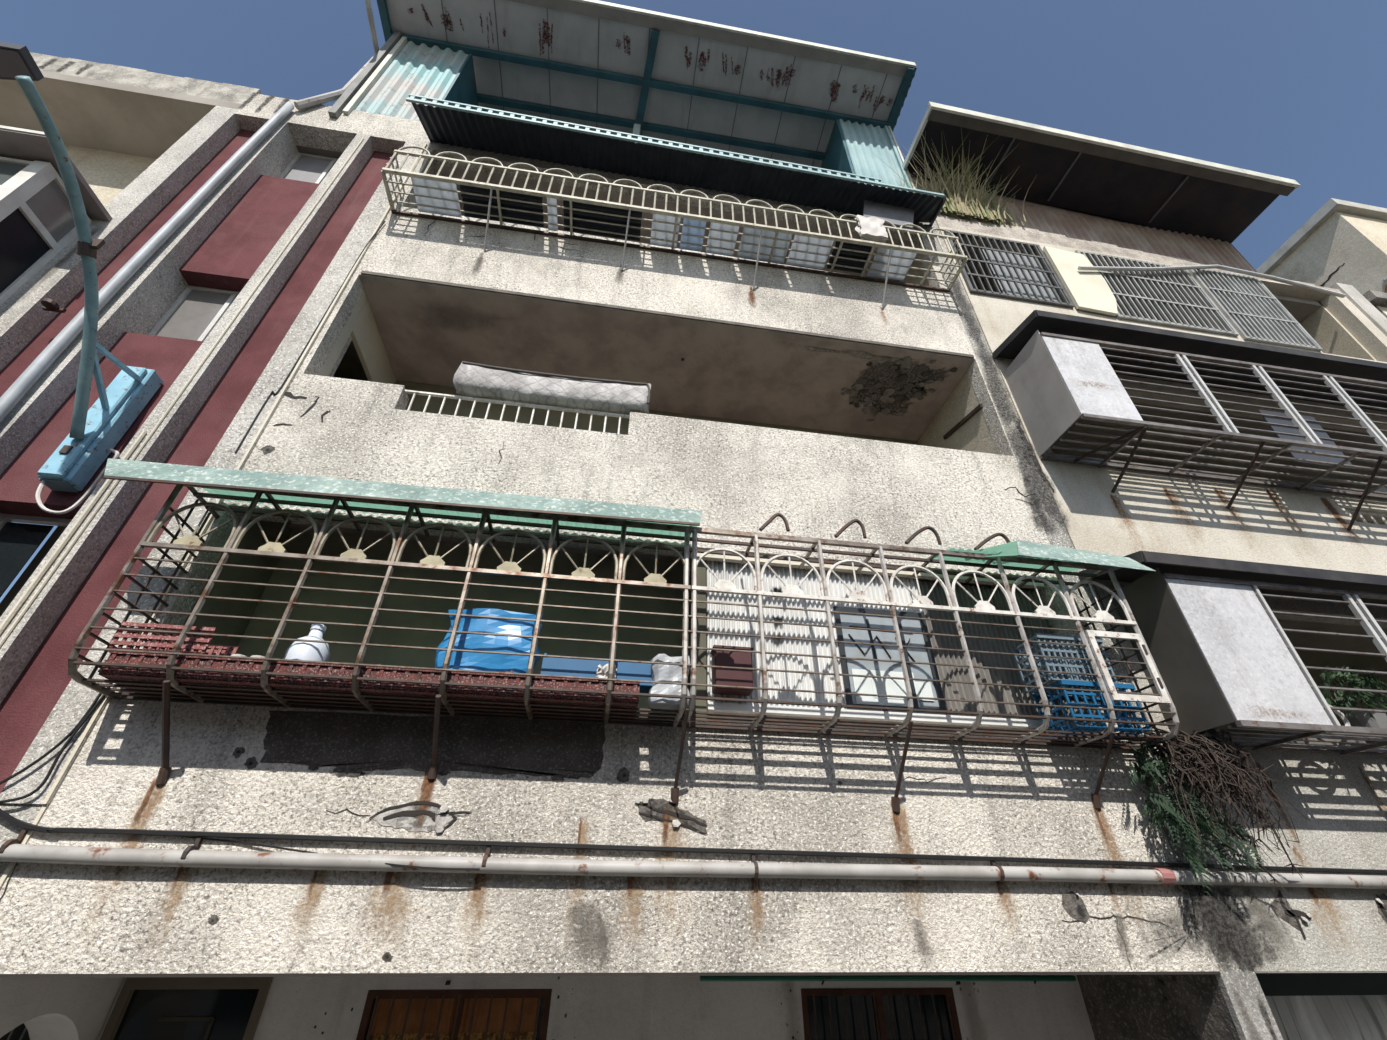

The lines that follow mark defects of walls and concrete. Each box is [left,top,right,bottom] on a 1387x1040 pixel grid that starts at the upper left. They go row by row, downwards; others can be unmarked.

rust [1321,498,1348,529]
peeling [233,710,606,782]
rust [126,779,161,847]
spalling [369,801,472,833]
rust [662,813,676,861]
spalling [635,797,707,834]
rust [891,804,912,854]
rust [1093,804,1115,860]
spalling [1062,891,1090,923]
leakage [1117,916,1127,947]
leakage [1151,884,1283,969]
spalling [1270,890,1312,939]